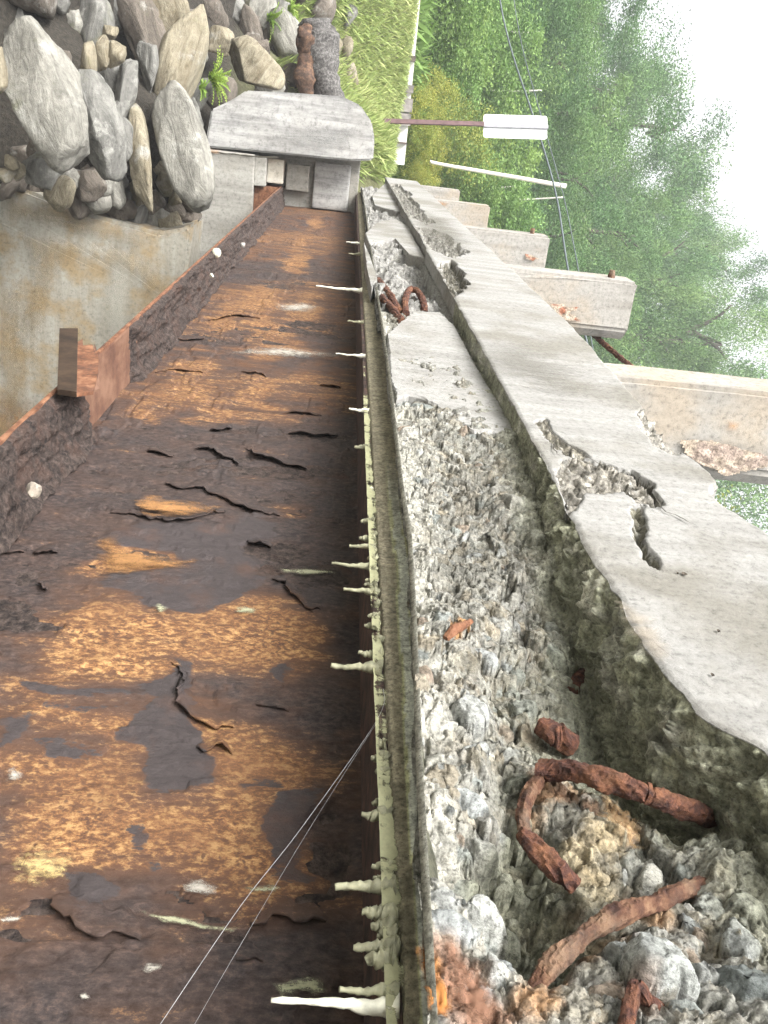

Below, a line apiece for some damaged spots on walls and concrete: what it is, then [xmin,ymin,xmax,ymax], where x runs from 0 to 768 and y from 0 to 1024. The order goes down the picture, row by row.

crack [543,420,616,468]
corrosion [110,479,280,521]
corrosion [100,539,192,573]
spalling [360,184,768,1024]
efflorescence [363,395,402,942]
corrosion [171,659,235,754]
corrosion [606,798,640,844]
corrosion [50,893,142,941]
corrosion [251,895,328,926]
efflorescence [384,958,404,1024]
corrosion [418,949,451,1015]
corrosion [450,943,495,1024]